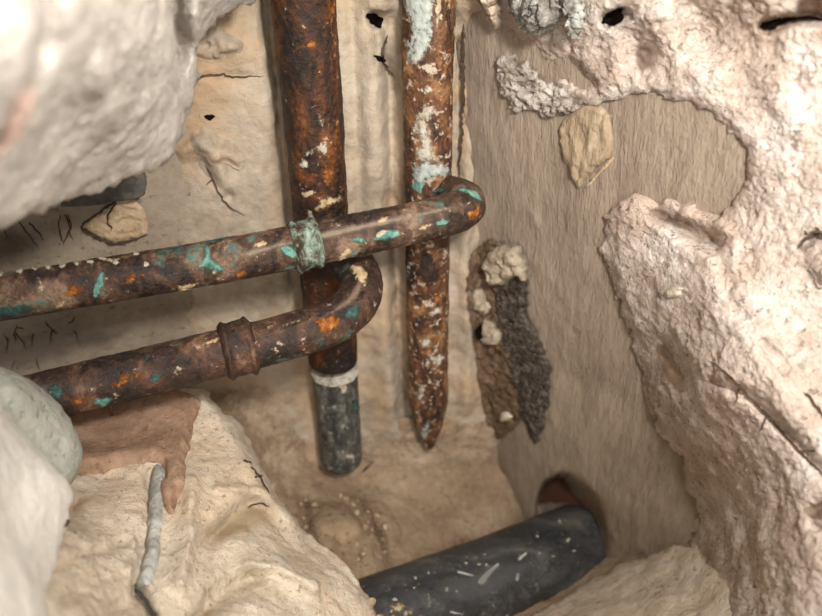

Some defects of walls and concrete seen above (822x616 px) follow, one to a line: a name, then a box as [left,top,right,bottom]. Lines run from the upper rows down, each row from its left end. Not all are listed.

crack [760,16,822,30]
crack [199,72,261,80]
spalling [637,42,659,68]
peeling [559,105,614,190]
crack [205,166,243,215]
crack [3,214,72,249]
crack [4,316,78,371]
spalling [466,238,553,444]
crack [708,359,822,475]